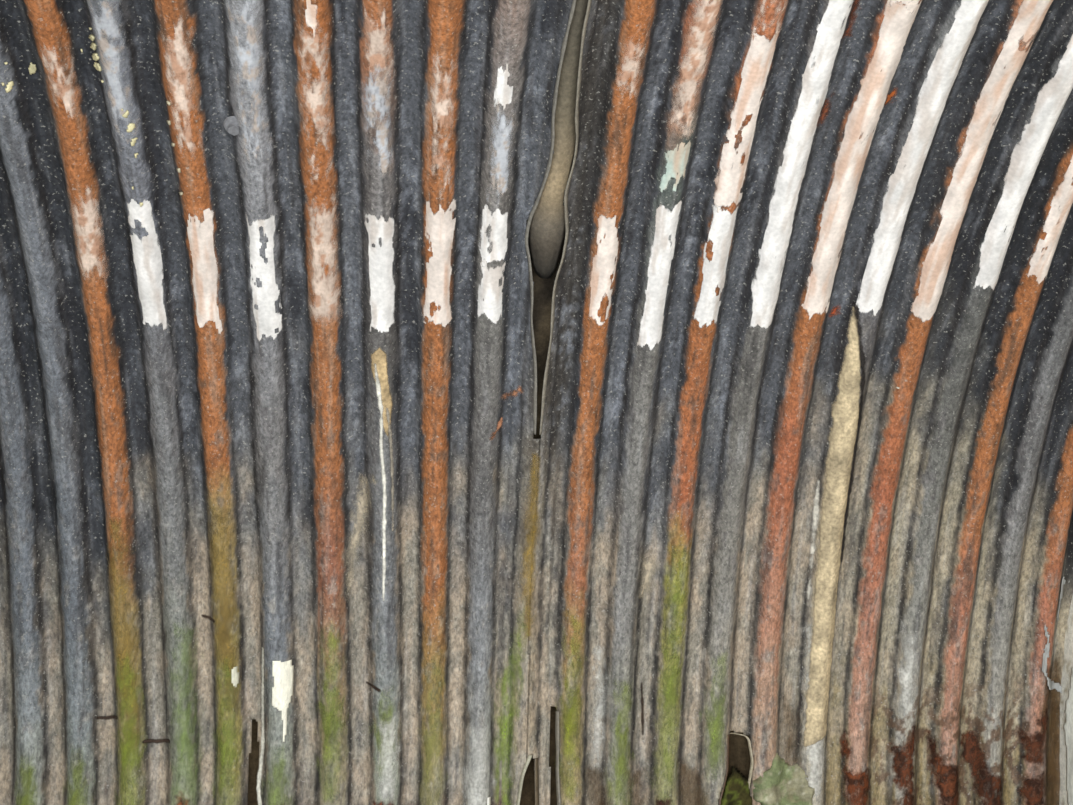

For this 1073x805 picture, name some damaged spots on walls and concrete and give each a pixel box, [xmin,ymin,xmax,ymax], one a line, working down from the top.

peeling [750,0,853,329]
peeling [911,0,1053,322]
peeling [973,35,1073,291]
peeling [127,199,167,330]
peeling [187,208,223,334]
peeling [247,215,282,341]
peeling [365,213,395,333]
peeling [423,199,456,327]
peeling [477,205,508,324]
corrosion [840,730,870,805]
corrosion [891,725,1002,805]
corrosion [1018,711,1048,805]